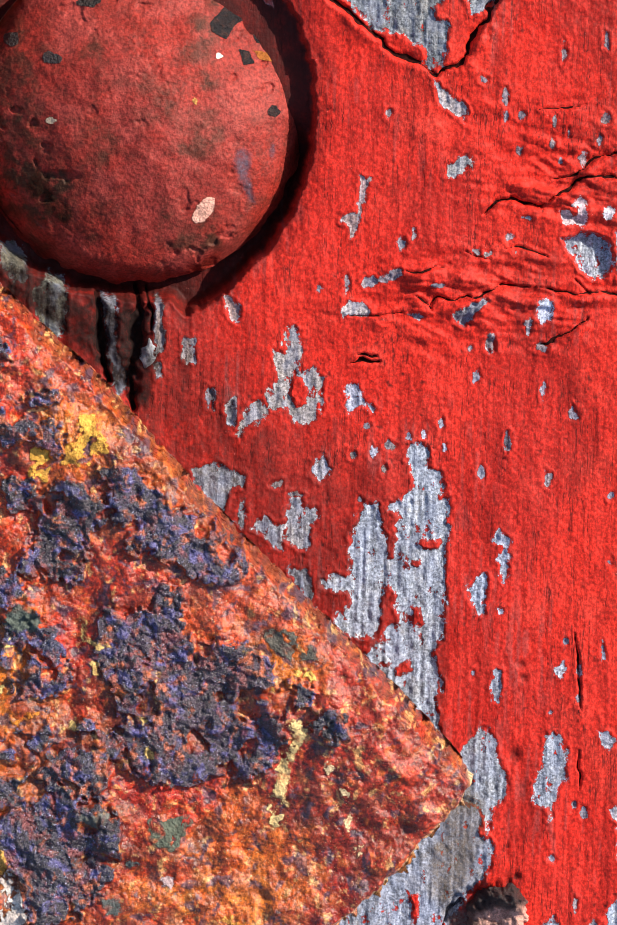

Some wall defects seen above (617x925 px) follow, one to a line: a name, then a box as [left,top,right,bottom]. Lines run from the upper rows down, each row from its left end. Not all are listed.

peeling [347,0,468,120]
crack [330,0,499,77]
crack [484,152,617,214]
crack [510,245,548,257]
peeling [205,324,325,437]
rust [28,447,51,482]
rust [61,411,109,467]
peeling [286,430,452,731]
rust [81,620,111,651]
rust [293,668,316,682]
peeling [531,732,569,823]
peeling [339,727,507,925]